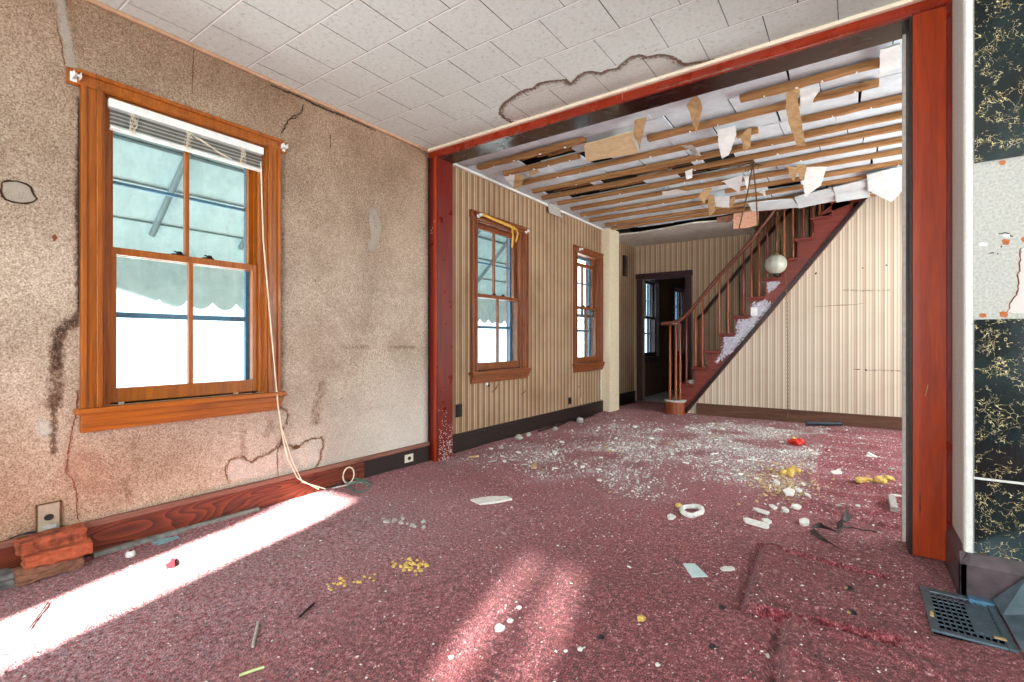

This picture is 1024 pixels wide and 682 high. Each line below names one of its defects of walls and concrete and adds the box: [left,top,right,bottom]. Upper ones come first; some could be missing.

crack [271,85,376,148]
leakage [498,54,713,123]
peeling [657,59,761,90]
peeling [0,180,38,204]
leakage [46,95,79,454]
crack [53,390,79,519]
crack [225,406,324,483]